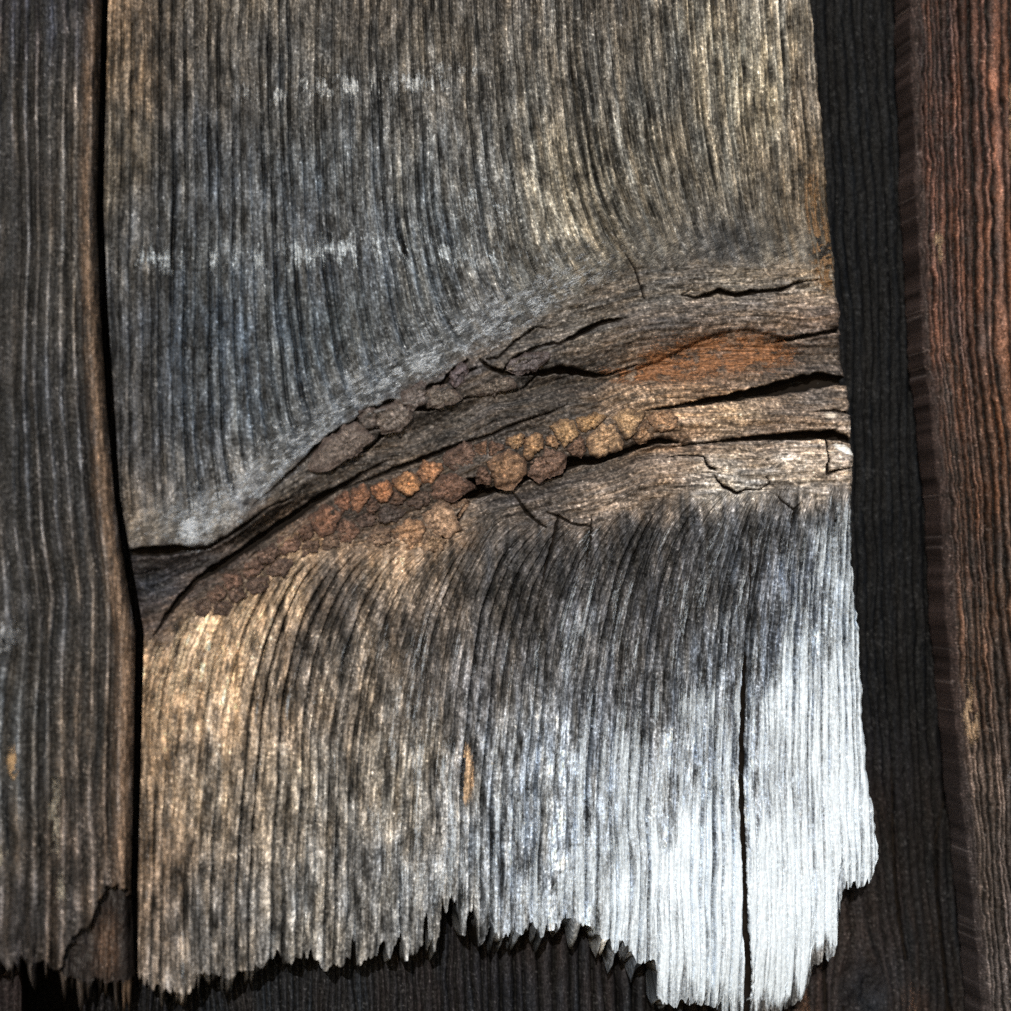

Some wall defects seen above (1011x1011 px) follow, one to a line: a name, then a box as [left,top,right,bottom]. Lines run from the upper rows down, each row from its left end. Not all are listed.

crack [681,280,817,299]
crack [764,329,835,344]
crack [133,317,638,635]
crack [442,373,850,597]
crack [738,538,752,1011]